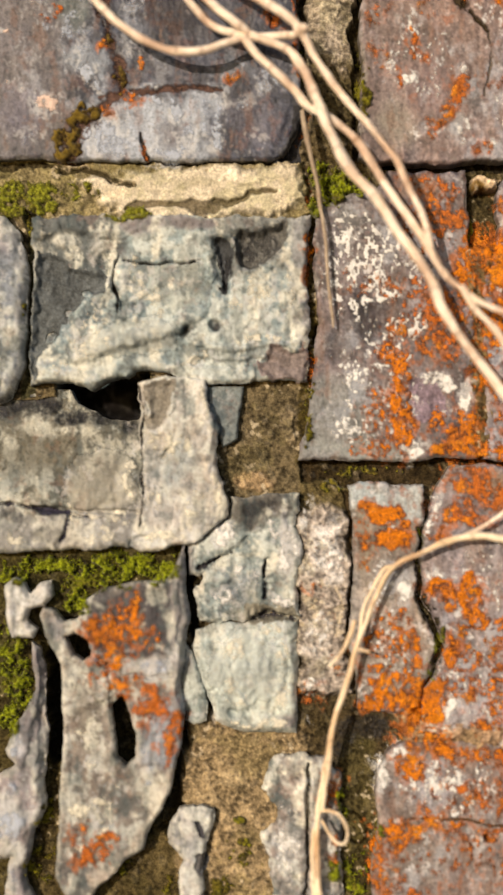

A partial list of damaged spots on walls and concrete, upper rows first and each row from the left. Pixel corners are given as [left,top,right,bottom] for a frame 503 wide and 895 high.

crack [57,0,223,166]
crack [454,0,492,96]
peeling [0,215,113,405]
spalling [209,218,288,295]
spalling [253,343,314,384]
peeling [0,375,244,895]
crack [414,526,441,665]